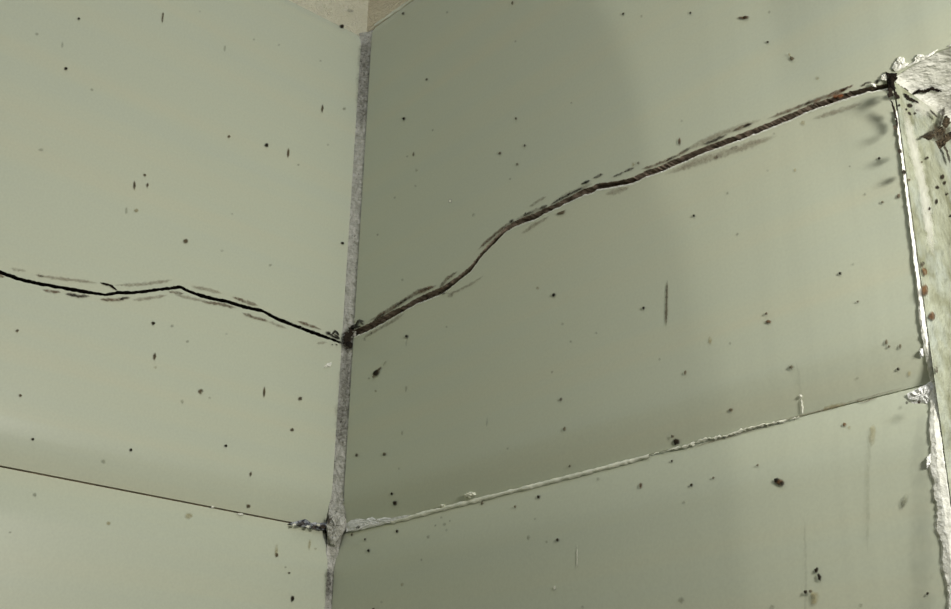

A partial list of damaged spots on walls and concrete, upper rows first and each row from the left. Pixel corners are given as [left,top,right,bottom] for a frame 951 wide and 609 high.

crack [0,71,942,345]